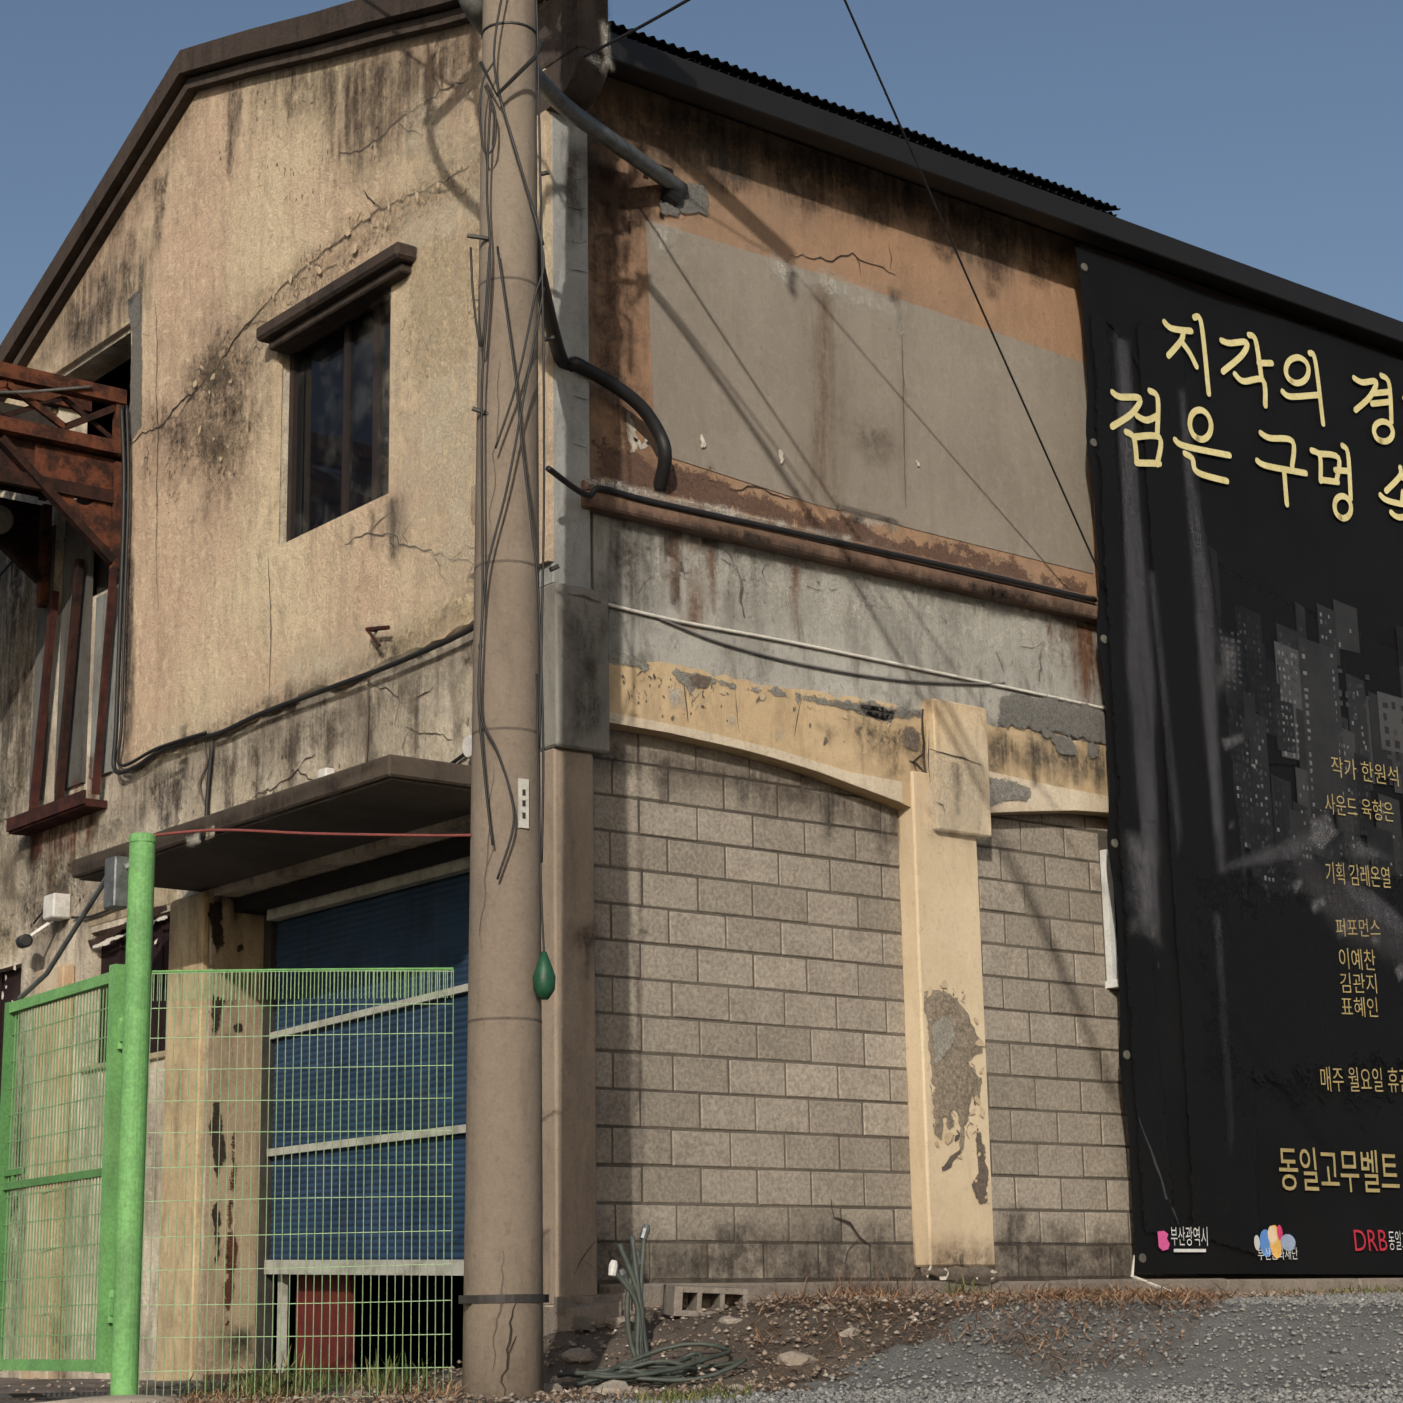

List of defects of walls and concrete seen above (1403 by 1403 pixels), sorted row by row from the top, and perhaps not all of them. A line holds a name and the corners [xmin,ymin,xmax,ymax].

damp [144,330,253,513]
crack [130,167,469,495]
damp [277,37,470,176]
crack [338,62,469,154]
crack [344,361,501,586]
damp [593,108,1016,279]
spalling [588,412,1087,600]
crack [790,247,896,275]
damp [0,550,123,929]
crack [245,755,314,801]
peeling [609,650,922,745]
peeling [924,980,989,1205]